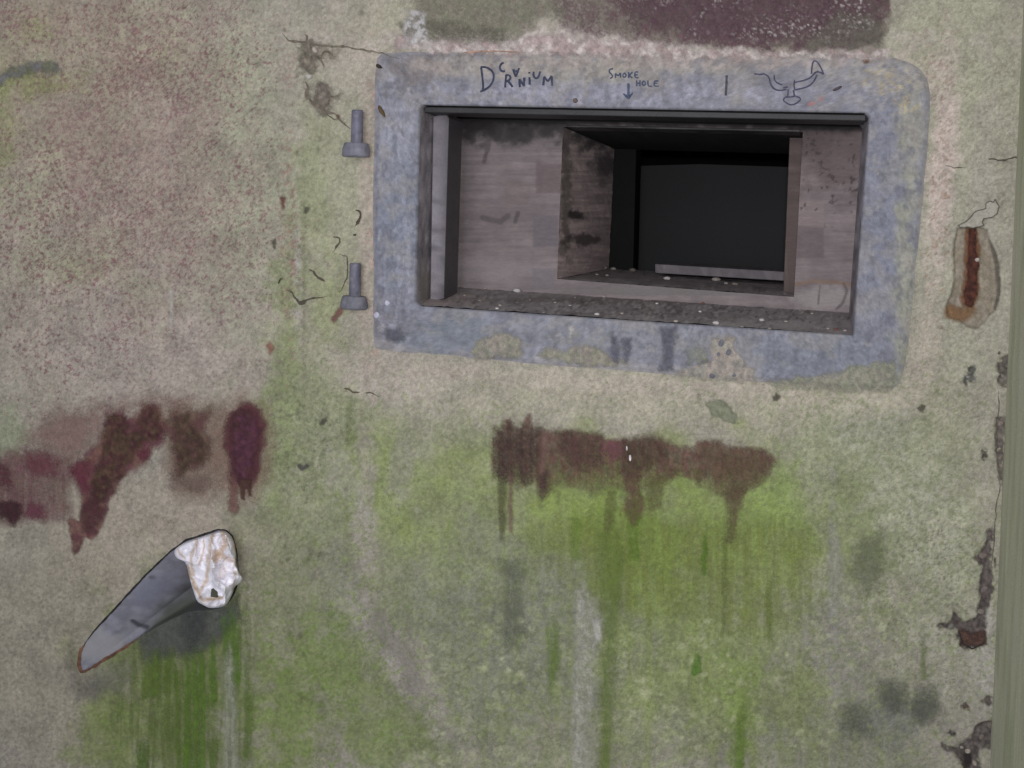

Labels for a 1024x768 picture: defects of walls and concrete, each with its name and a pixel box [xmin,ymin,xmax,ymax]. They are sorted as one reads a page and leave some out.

crack [282,33,400,129]
rust [944,228,980,321]
spalling [964,366,975,385]
rust [0,402,266,554]
rust [492,416,774,534]
spalling [982,416,1005,480]
damp [139,604,239,663]
damp [225,652,238,768]
damp [573,591,602,768]
spalling [939,530,994,650]
spalling [941,721,992,768]